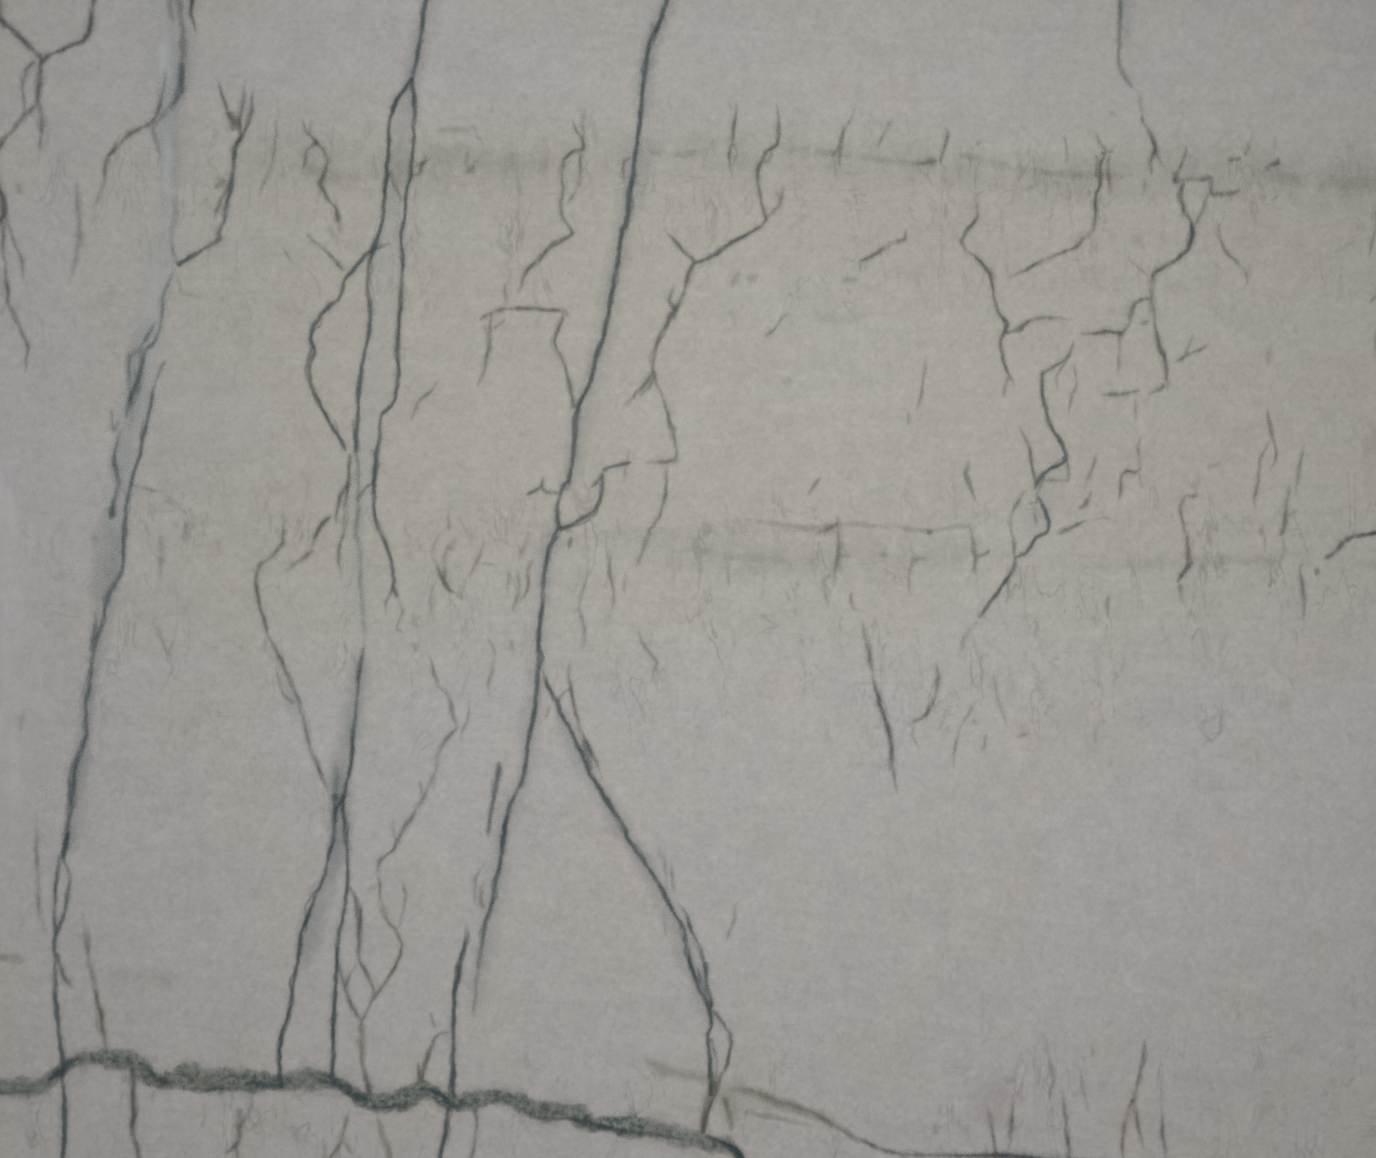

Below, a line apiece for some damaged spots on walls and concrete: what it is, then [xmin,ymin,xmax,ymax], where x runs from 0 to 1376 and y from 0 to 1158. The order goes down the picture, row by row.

crack [0,14,93,86]
crack [0,191,8,216]
crack [1001,316,1024,334]
crack [983,361,1067,612]
crack [38,0,744,1158]
crack [956,1117,1034,1158]